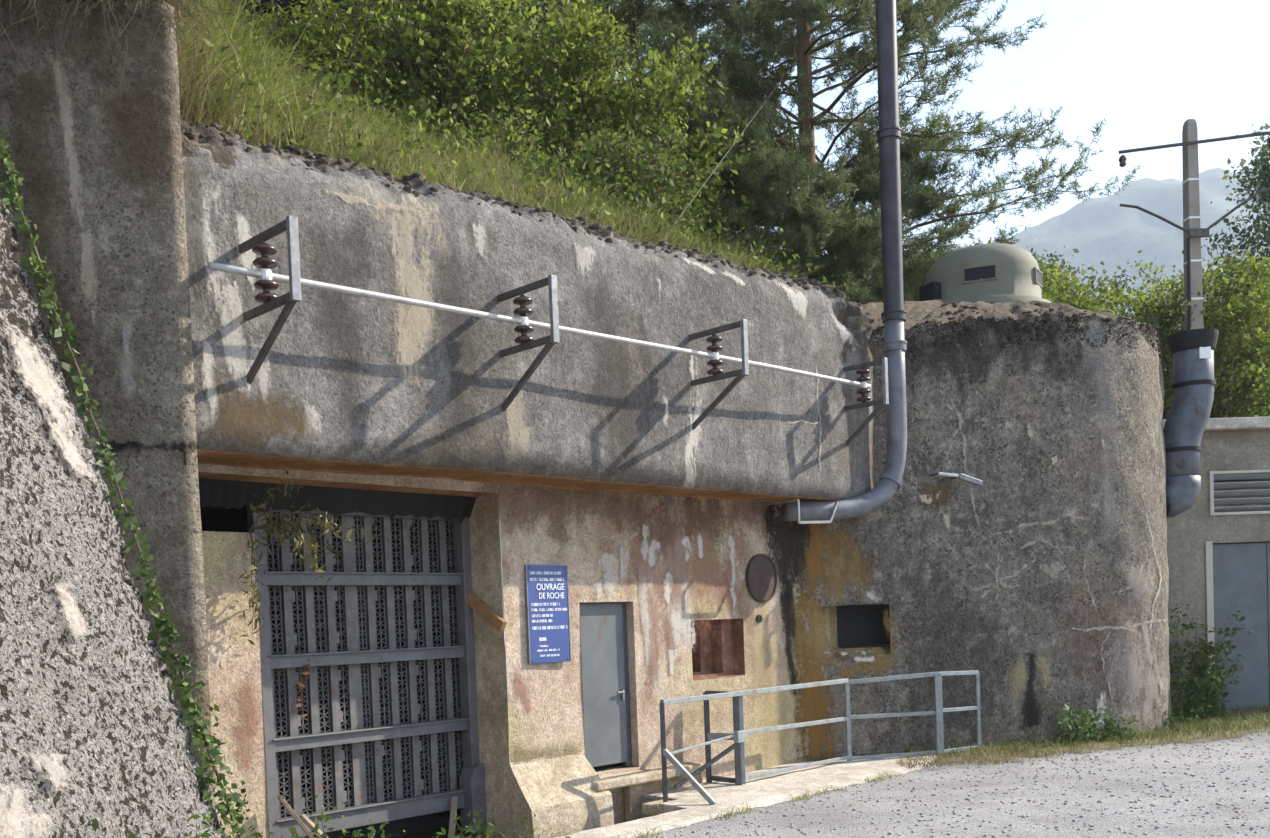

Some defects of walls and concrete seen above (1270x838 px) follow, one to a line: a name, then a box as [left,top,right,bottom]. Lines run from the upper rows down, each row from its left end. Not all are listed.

flaking render [0,314,95,479]
corrosion [628,497,754,684]
leakage [765,504,813,695]
corrosion [795,523,840,761]
leakage [1022,650,1043,729]
crack [945,400,1167,697]